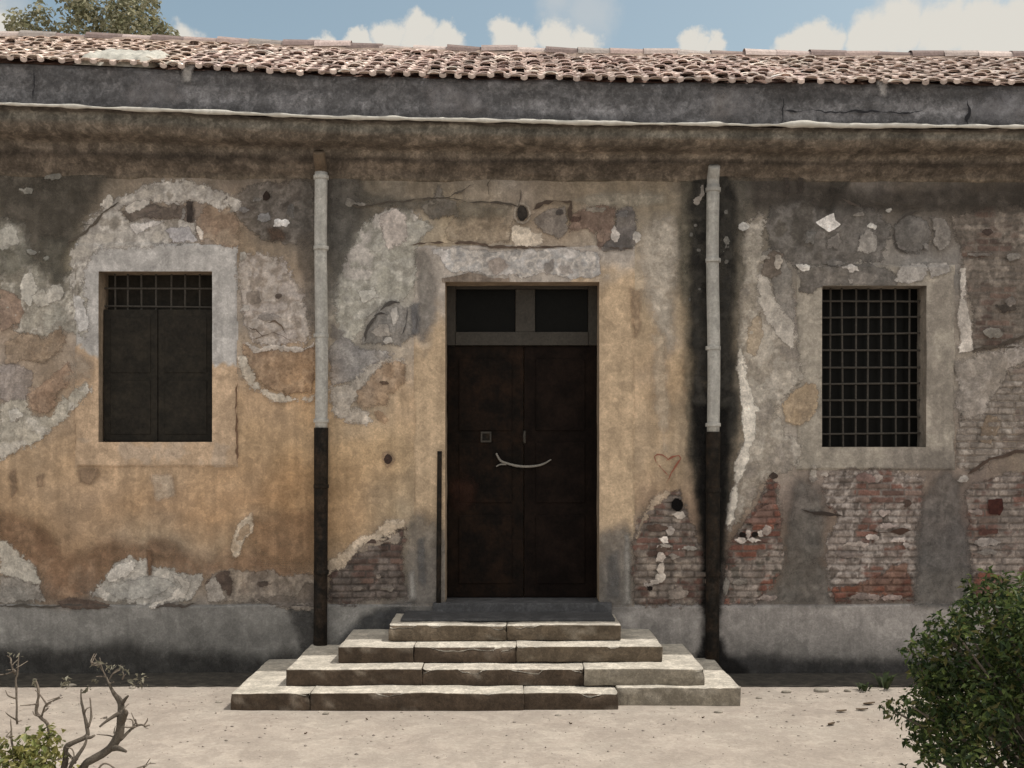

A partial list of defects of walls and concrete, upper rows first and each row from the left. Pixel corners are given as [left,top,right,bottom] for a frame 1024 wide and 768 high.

crack [782,95,920,121]
crack [964,100,972,124]
crack [352,179,521,208]
peeling [0,178,315,403]
peeling [328,185,681,431]
damp [678,176,1024,658]
peeling [723,181,1024,608]
peeling [90,512,314,611]
spalling [327,519,412,608]
spalling [629,490,706,610]
damp [0,605,314,674]
damp [719,640,936,674]